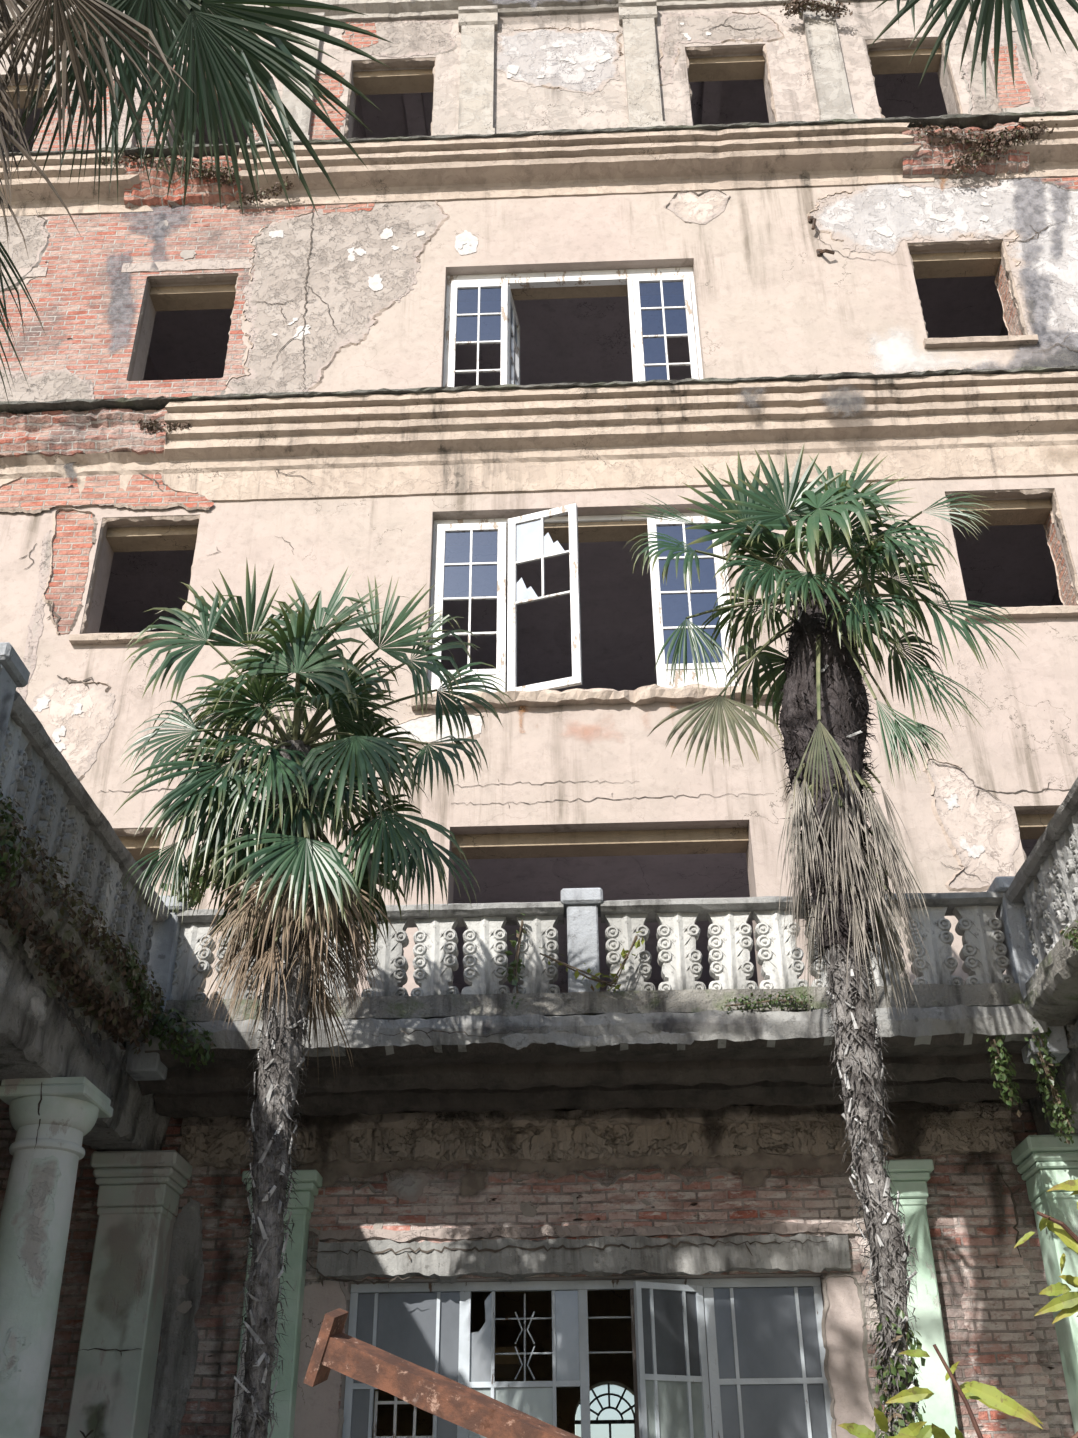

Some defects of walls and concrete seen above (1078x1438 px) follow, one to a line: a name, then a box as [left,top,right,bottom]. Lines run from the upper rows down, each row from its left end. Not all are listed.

peeling [494,27,624,96]
flaking render [961,29,1046,115]
flaking render [0,198,450,399]
peeling [455,230,478,255]
water stain [876,333,952,371]
peeling [807,175,1078,335]
water stain [972,177,1078,370]
flaking render [0,472,214,635]
flaking render [29,677,117,781]
flaking render [923,758,1020,892]